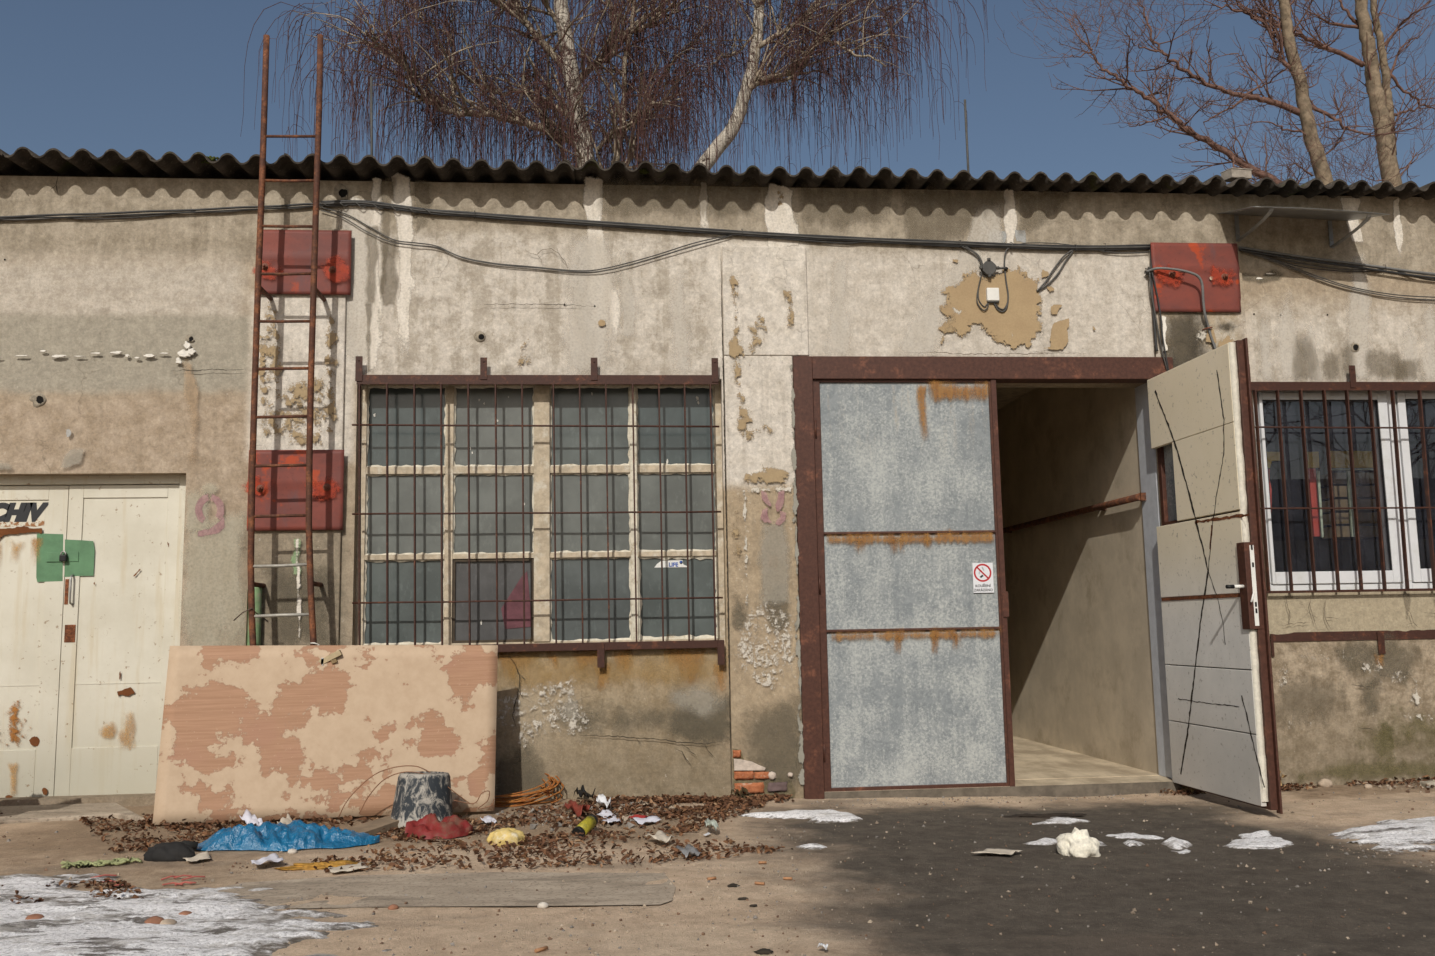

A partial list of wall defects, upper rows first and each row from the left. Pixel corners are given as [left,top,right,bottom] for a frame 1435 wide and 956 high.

leakage [699,182,709,228]
efflorescence [764,184,799,247]
peeling [783,290,795,327]
peeling [938,259,1069,350]
peeling [259,305,338,445]
peeling [728,275,771,441]
corrosion [917,379,988,429]
corrosion [0,526,42,552]
corrosion [828,530,994,548]
corrosion [833,629,996,647]
leakage [1341,640,1412,712]